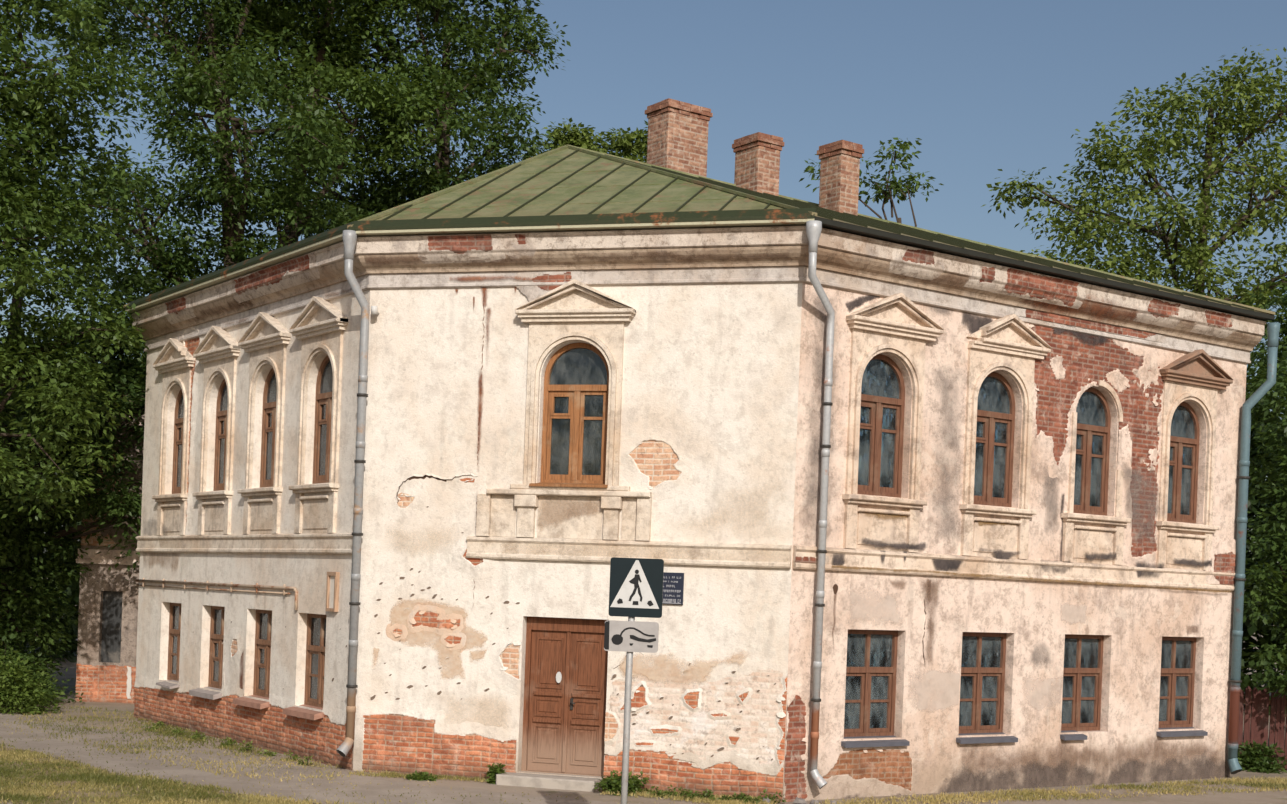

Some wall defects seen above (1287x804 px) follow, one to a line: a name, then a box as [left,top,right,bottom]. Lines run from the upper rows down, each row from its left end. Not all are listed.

flaking render [231,252,320,303]
flaking render [416,233,584,302]
flaking render [888,244,946,281]
flaking render [963,261,1240,567]
flaking render [444,464,487,499]
flaking render [619,427,695,503]
flaking render [133,567,522,779]
peeling [603,654,924,802]